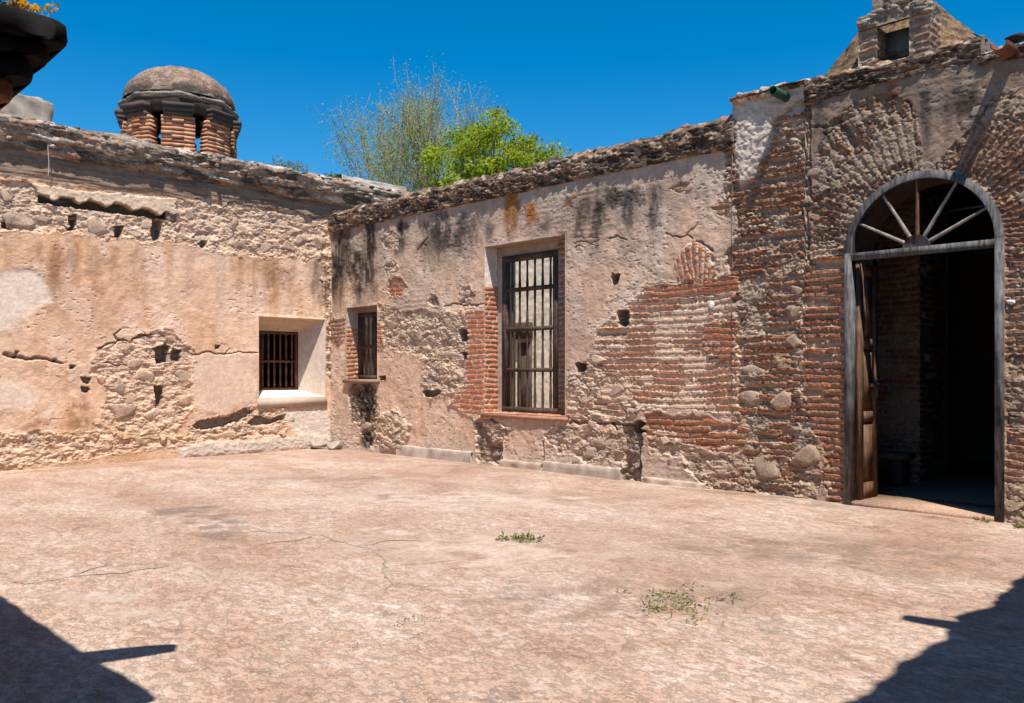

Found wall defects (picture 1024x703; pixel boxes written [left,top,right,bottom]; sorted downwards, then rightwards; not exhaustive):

spalling [0,180,346,377]
water stain [312,223,376,298]
water stain [425,213,478,250]
water stain [576,187,660,239]
crack [665,221,714,253]
spalling [542,86,1024,524]
crack [1,350,64,365]
crack [97,328,153,368]
crack [191,348,259,357]
spalling [375,230,515,465]
spalling [0,327,295,469]
spalling [347,375,386,449]